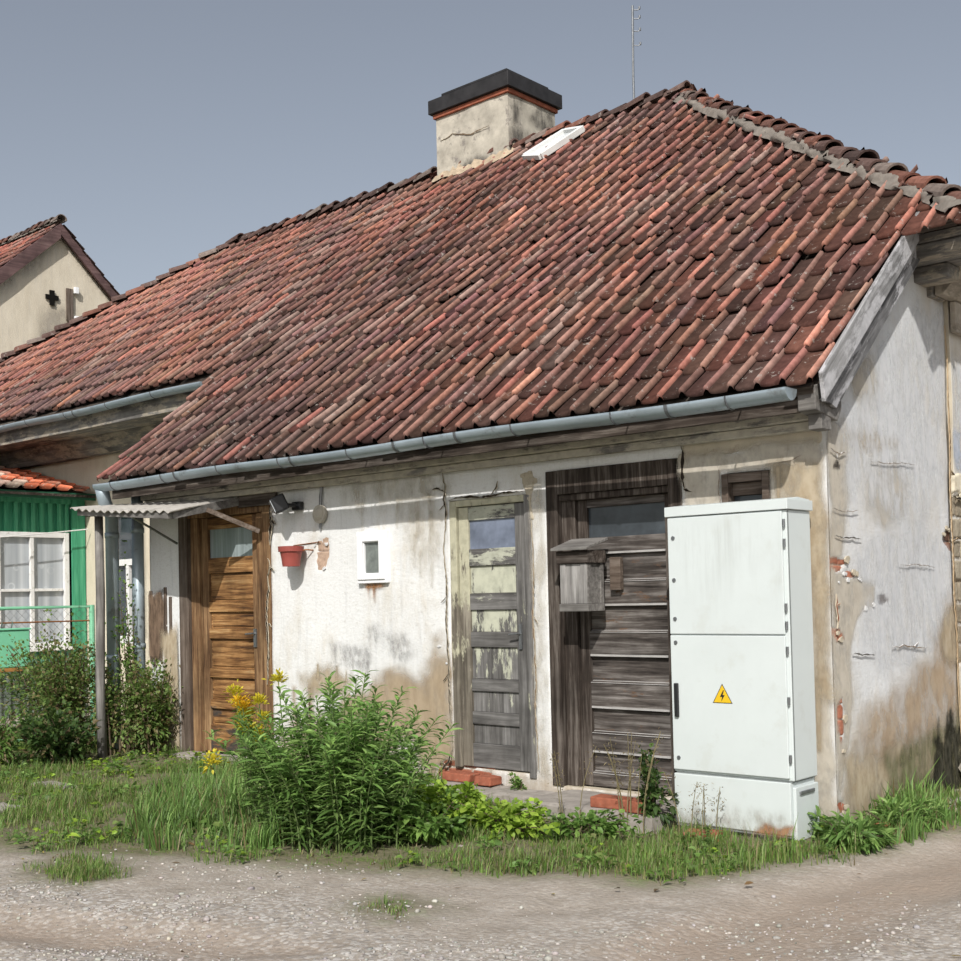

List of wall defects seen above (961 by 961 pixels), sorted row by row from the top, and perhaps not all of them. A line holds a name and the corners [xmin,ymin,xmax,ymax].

spalling [313,537,329,570]
water stain [307,664,347,705]
peeling [678,421,898,822]
water stain [846,605,961,818]
spalling [942,473,961,663]